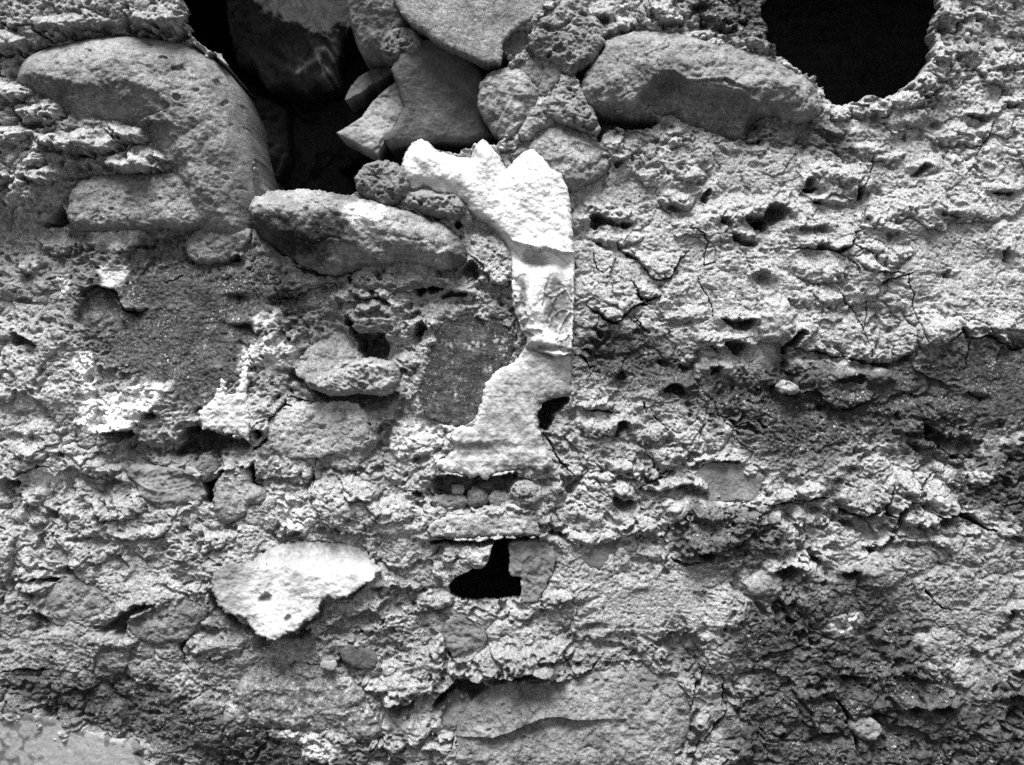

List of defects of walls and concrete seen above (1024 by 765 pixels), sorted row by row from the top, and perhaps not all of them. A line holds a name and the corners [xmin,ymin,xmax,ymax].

spalling [760,0,937,106]
spalling [184,0,375,196]
spalling [597,121,652,142]
crack [586,227,716,336]
crack [794,155,1024,371]
crack [589,402,670,431]
crack [638,450,674,490]
crack [763,472,999,550]
spalling [430,536,539,601]